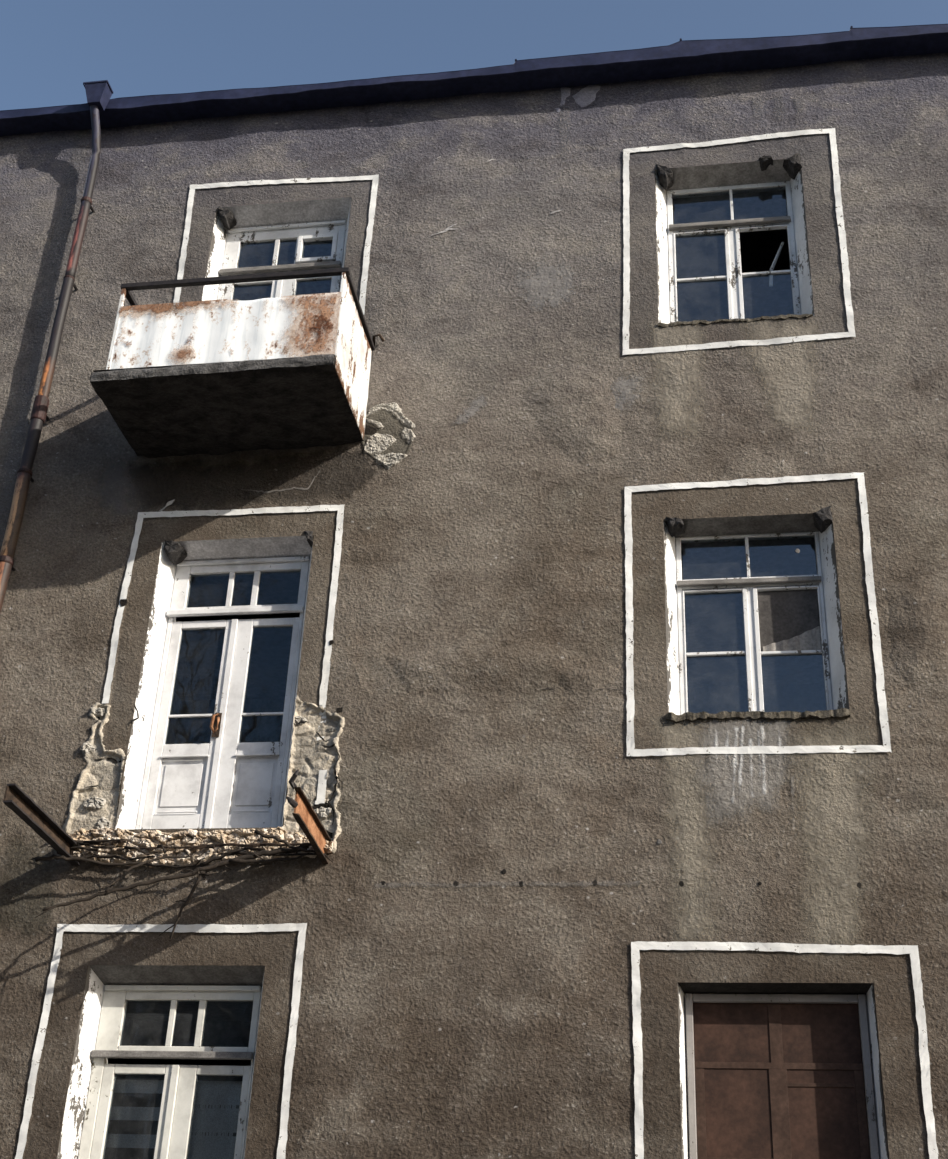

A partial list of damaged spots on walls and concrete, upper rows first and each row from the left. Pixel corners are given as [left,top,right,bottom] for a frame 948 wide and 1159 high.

peeling [555,85,601,157]
rust [119,299,232,322]
rust [171,336,194,362]
rust [283,292,342,357]
peeling [361,402,416,469]
spalling [62,695,345,868]
water stain [659,718,872,945]